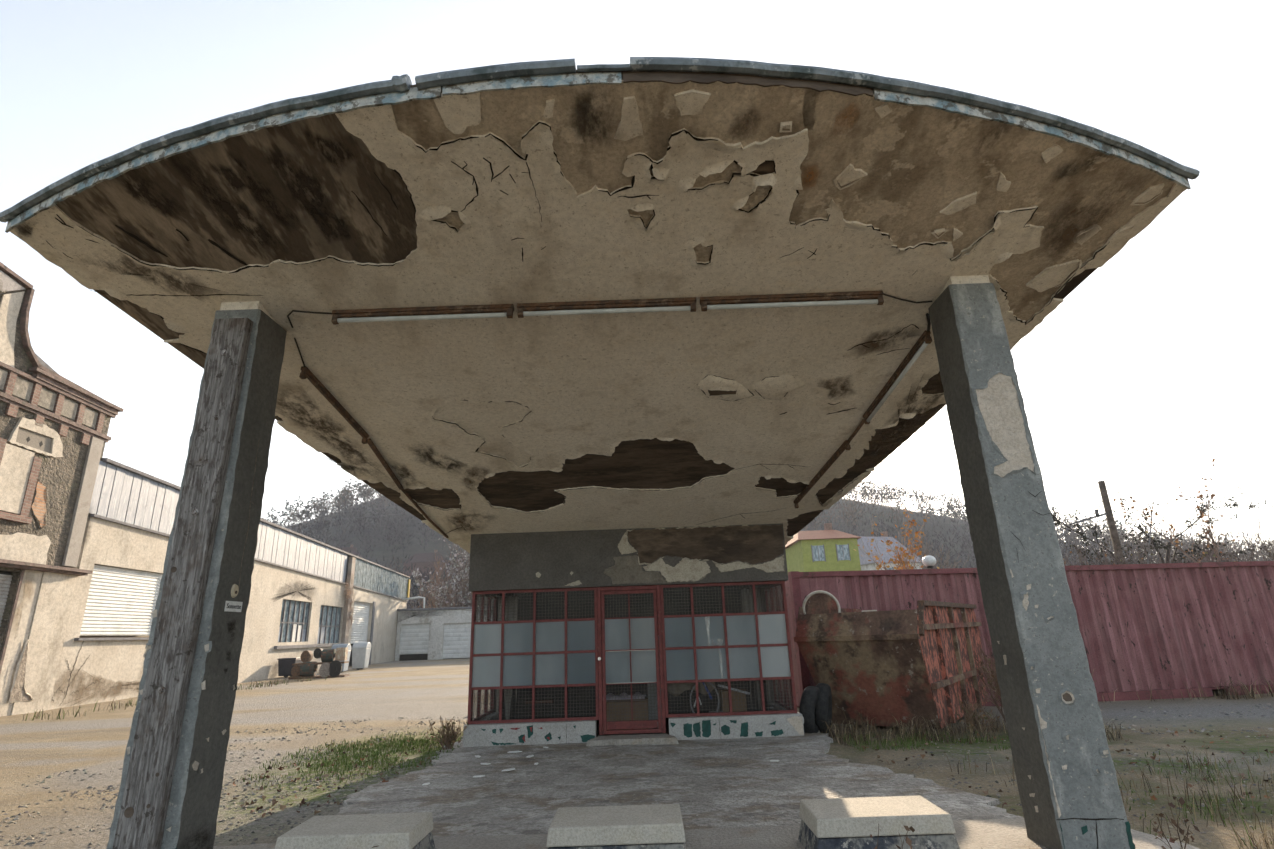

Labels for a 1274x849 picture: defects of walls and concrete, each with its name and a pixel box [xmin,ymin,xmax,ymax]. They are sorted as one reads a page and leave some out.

spalling [56,114,472,273]
peeling [391,80,1175,325]
spalling [361,478,463,520]
spalling [474,436,735,513]
spalling [603,371,944,586]
peeling [972,371,1036,478]
peeling [480,725,561,745]
peeling [670,715,804,738]